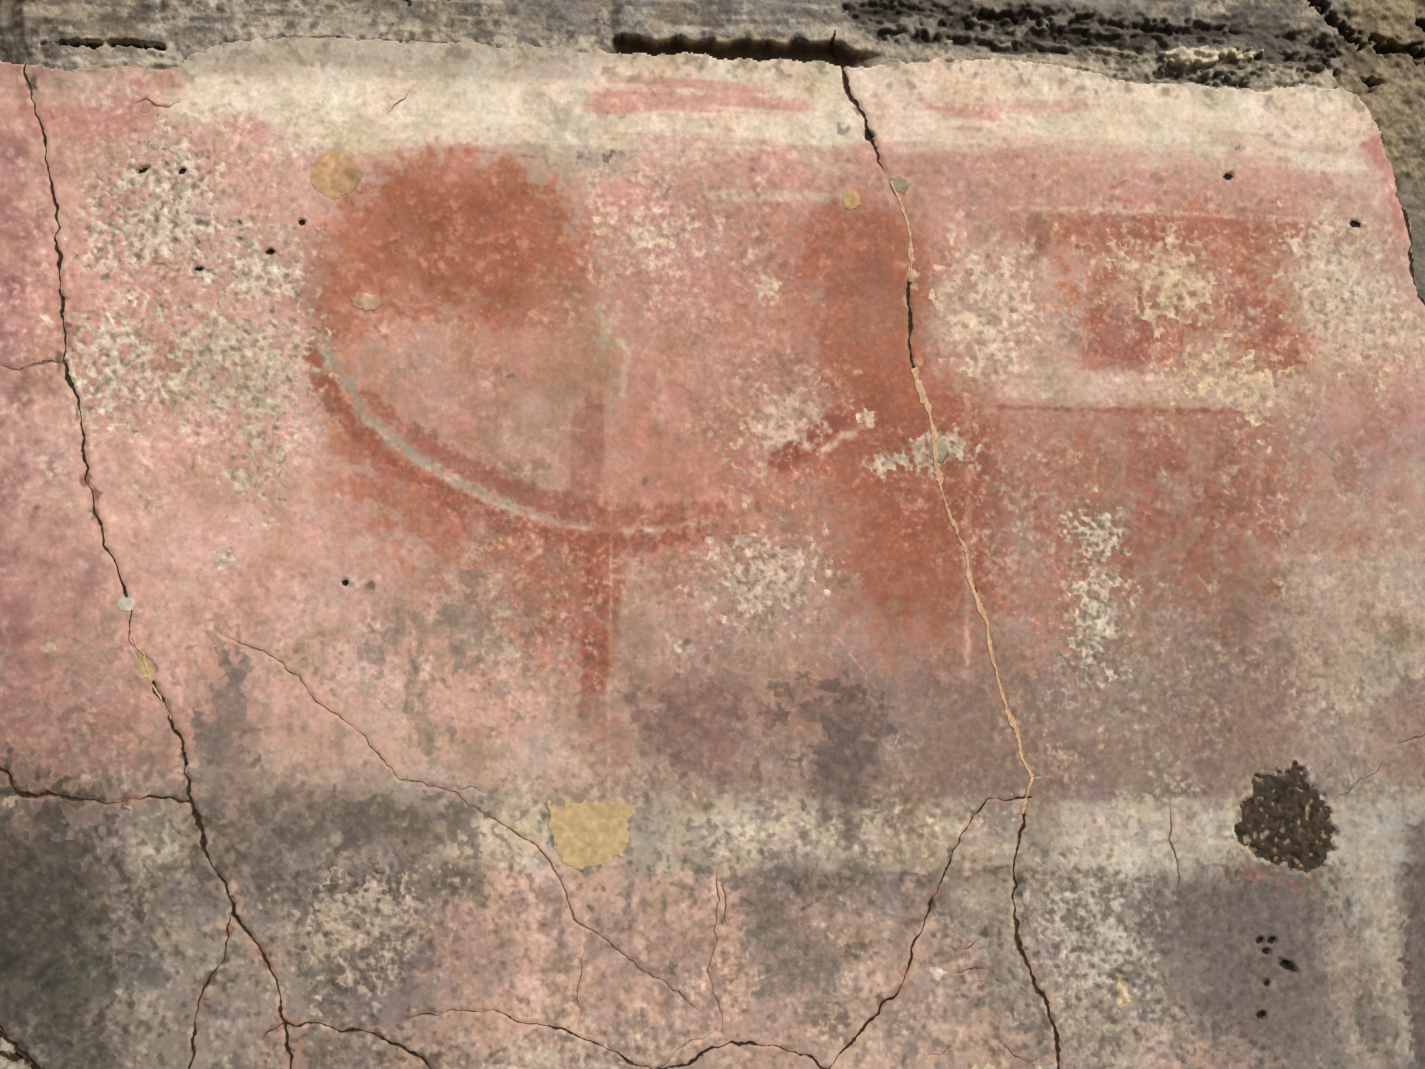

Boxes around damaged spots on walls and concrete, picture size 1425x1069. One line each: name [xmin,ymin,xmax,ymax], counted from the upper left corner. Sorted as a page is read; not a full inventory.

crack [827,30,884,170]
crack [1382,141,1425,304]
crack [0,63,1061,1069]
spalling [1234,763,1338,874]
crack [1334,734,1425,802]